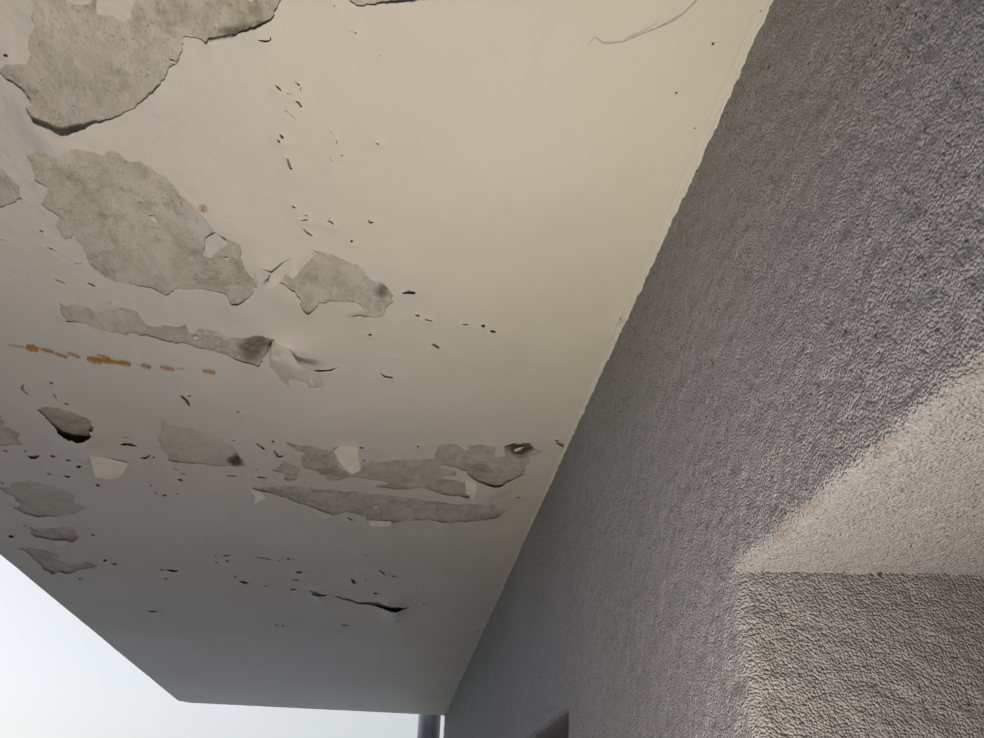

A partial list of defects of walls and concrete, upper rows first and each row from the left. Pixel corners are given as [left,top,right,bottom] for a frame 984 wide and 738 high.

peeling [343,0,468,19]
peeling [0,0,408,324]
corrosion [26,345,174,371]
peeling [50,296,280,374]
flaking render [149,412,567,527]
peeling [0,477,105,577]
crack [289,551,431,627]